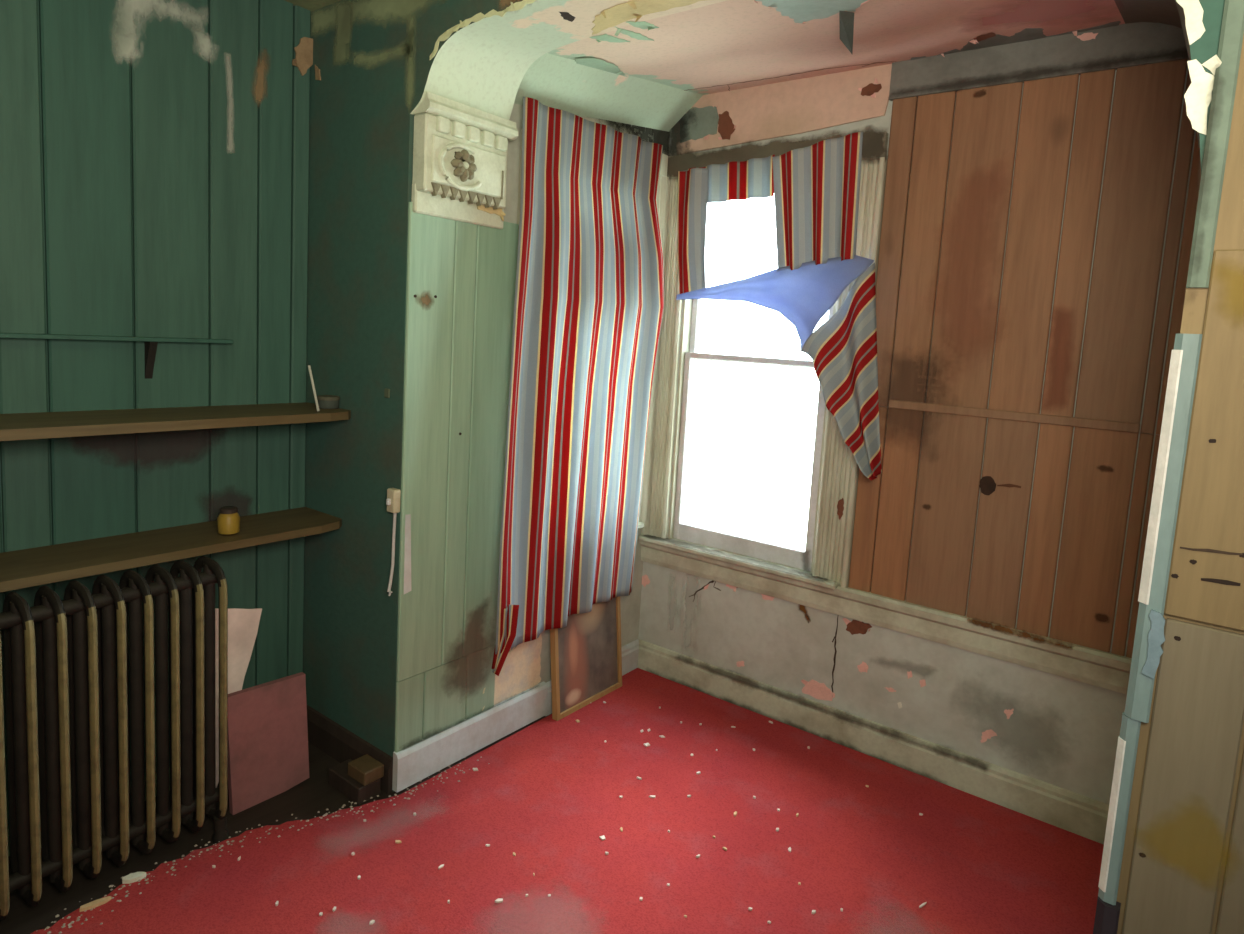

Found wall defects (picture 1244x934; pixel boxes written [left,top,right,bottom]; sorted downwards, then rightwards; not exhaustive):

water stain [115,0,212,57]
water stain [285,0,428,106]
peeling [430,0,536,60]
peeling [589,0,705,43]
peeling [753,0,869,54]
peeling [910,21,1121,60]
peeling [1176,0,1205,45]
flaking render [858,78,882,98]
peeling [1184,55,1222,135]
peeling [684,106,737,142]
flaking render [843,618,872,635]
crack [830,617,838,692]